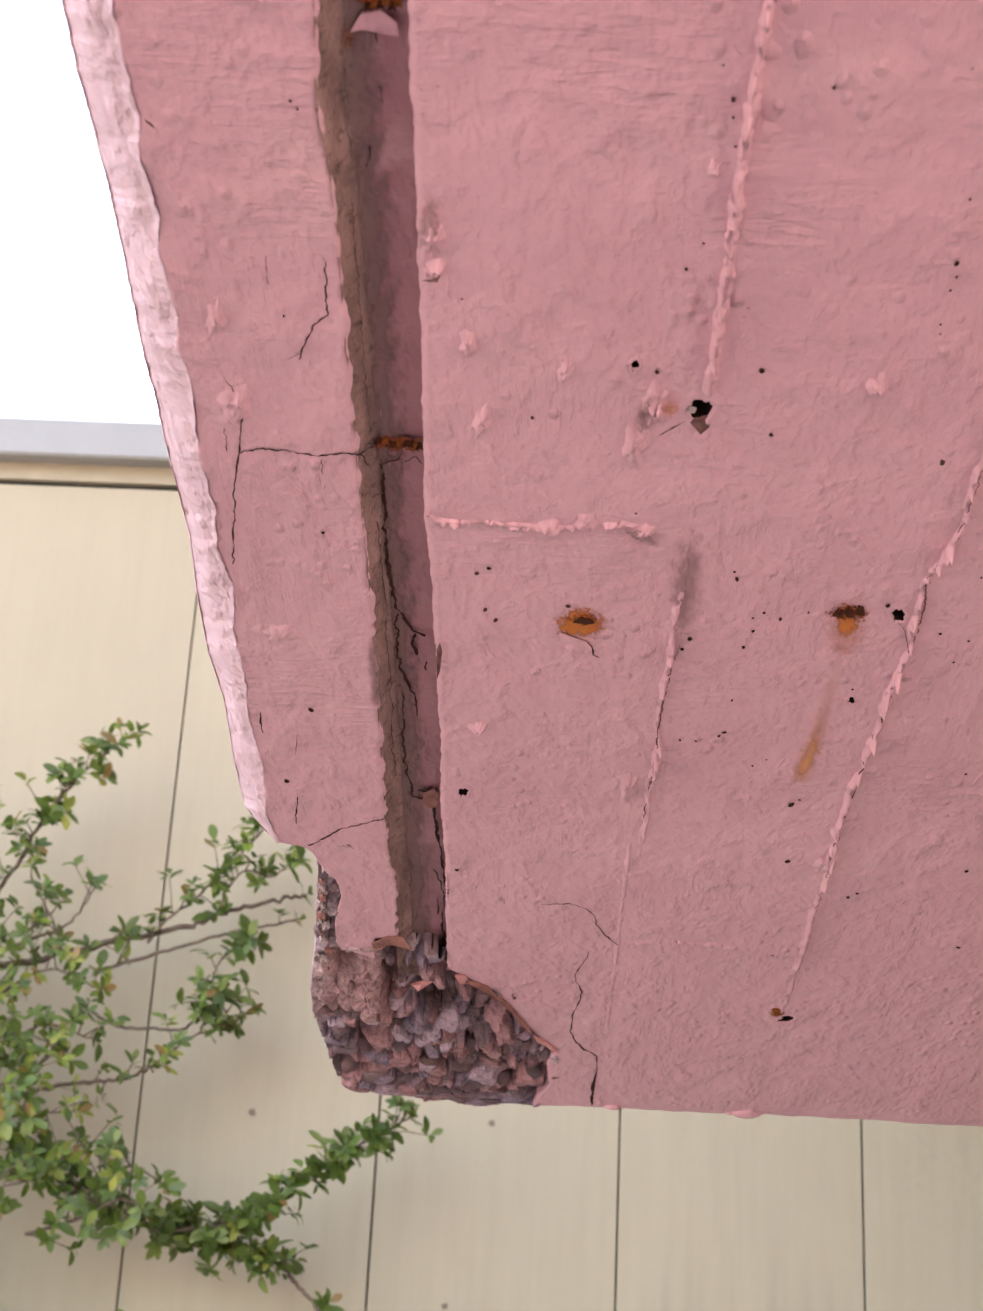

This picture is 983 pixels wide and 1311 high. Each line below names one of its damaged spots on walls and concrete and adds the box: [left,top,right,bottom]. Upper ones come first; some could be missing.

crack [345,8,399,45]
rust [375,436,423,452]
crack [223,203,453,966]
rust [557,608,604,636]
rust [828,605,868,637]
spalling [310,860,559,1108]
crack [542,903,618,1105]